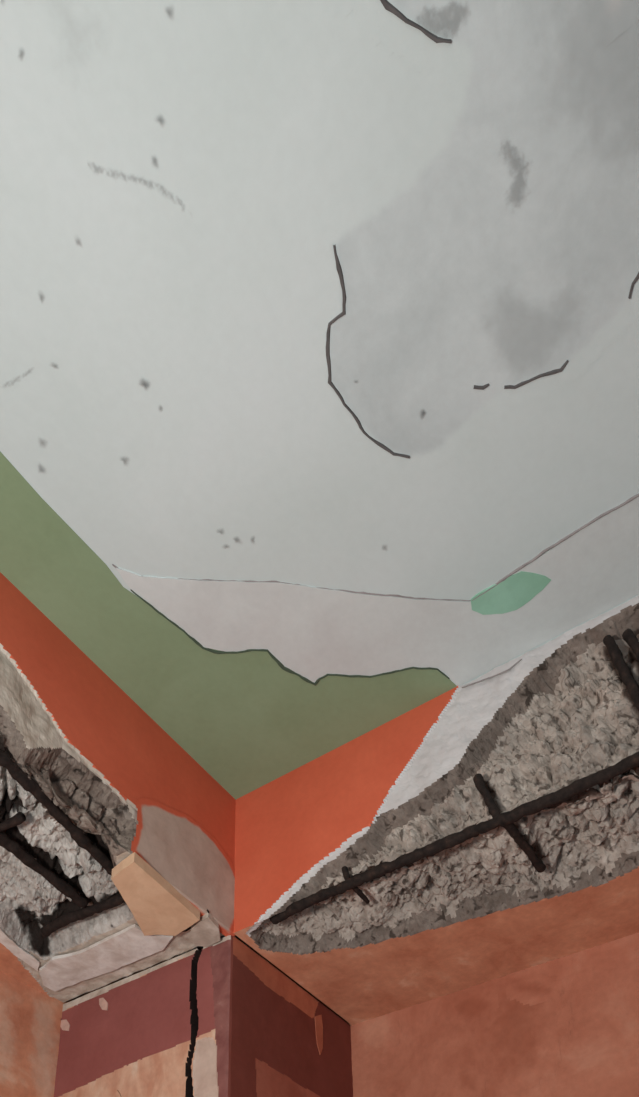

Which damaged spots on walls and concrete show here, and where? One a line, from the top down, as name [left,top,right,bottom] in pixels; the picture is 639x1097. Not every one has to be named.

crack [182,909,209,1097]
spalling [0,493,639,1011]